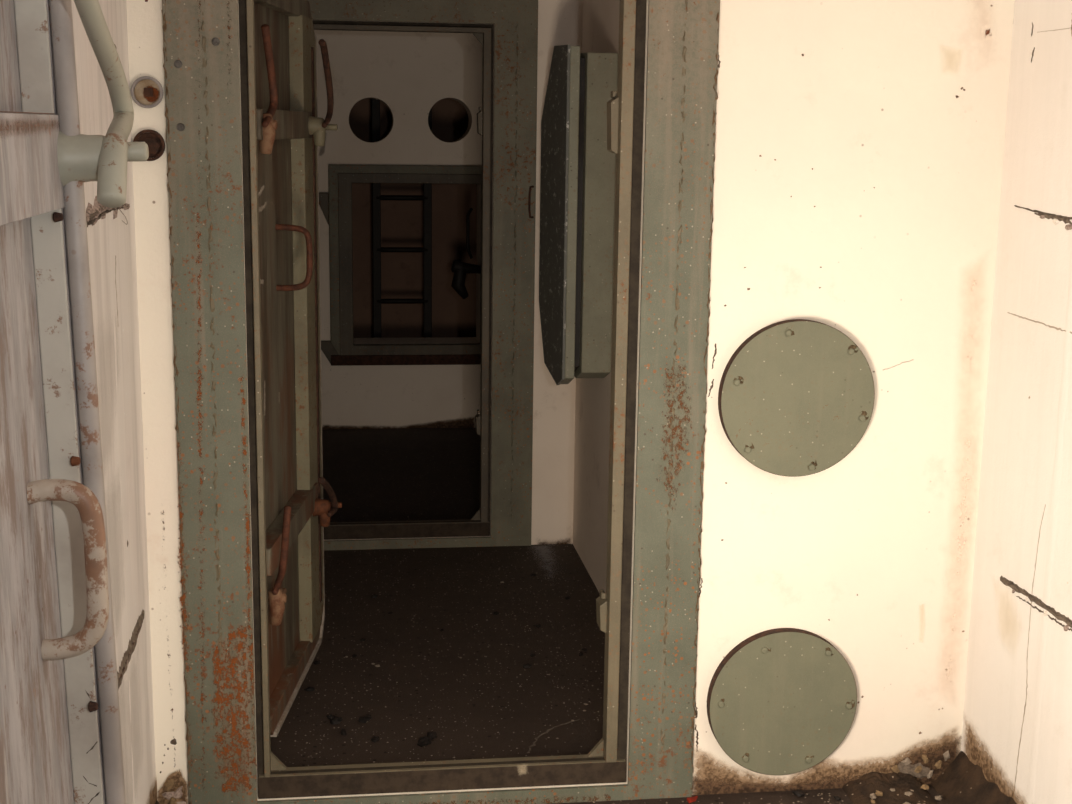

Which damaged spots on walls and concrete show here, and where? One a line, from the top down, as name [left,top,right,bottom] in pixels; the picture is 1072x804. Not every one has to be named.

corrosion [143,0,173,239]
crack [1014,205,1072,230]
corrosion [164,213,257,804]
corrosion [659,7,720,790]
crack [117,610,145,690]
leakage [693,725,1025,804]
crack [1000,504,1072,792]